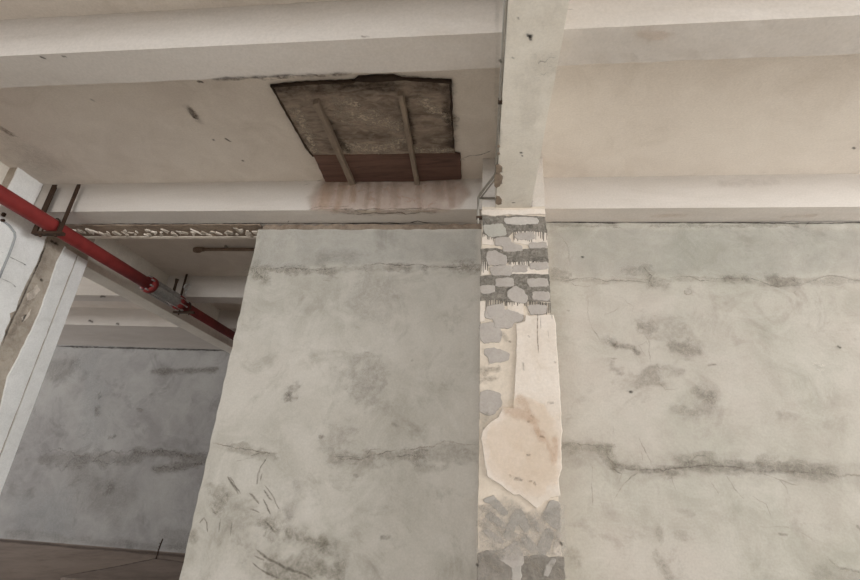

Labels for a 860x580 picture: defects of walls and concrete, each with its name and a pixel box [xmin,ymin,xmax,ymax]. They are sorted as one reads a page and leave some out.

flaking render [481,315,562,509]